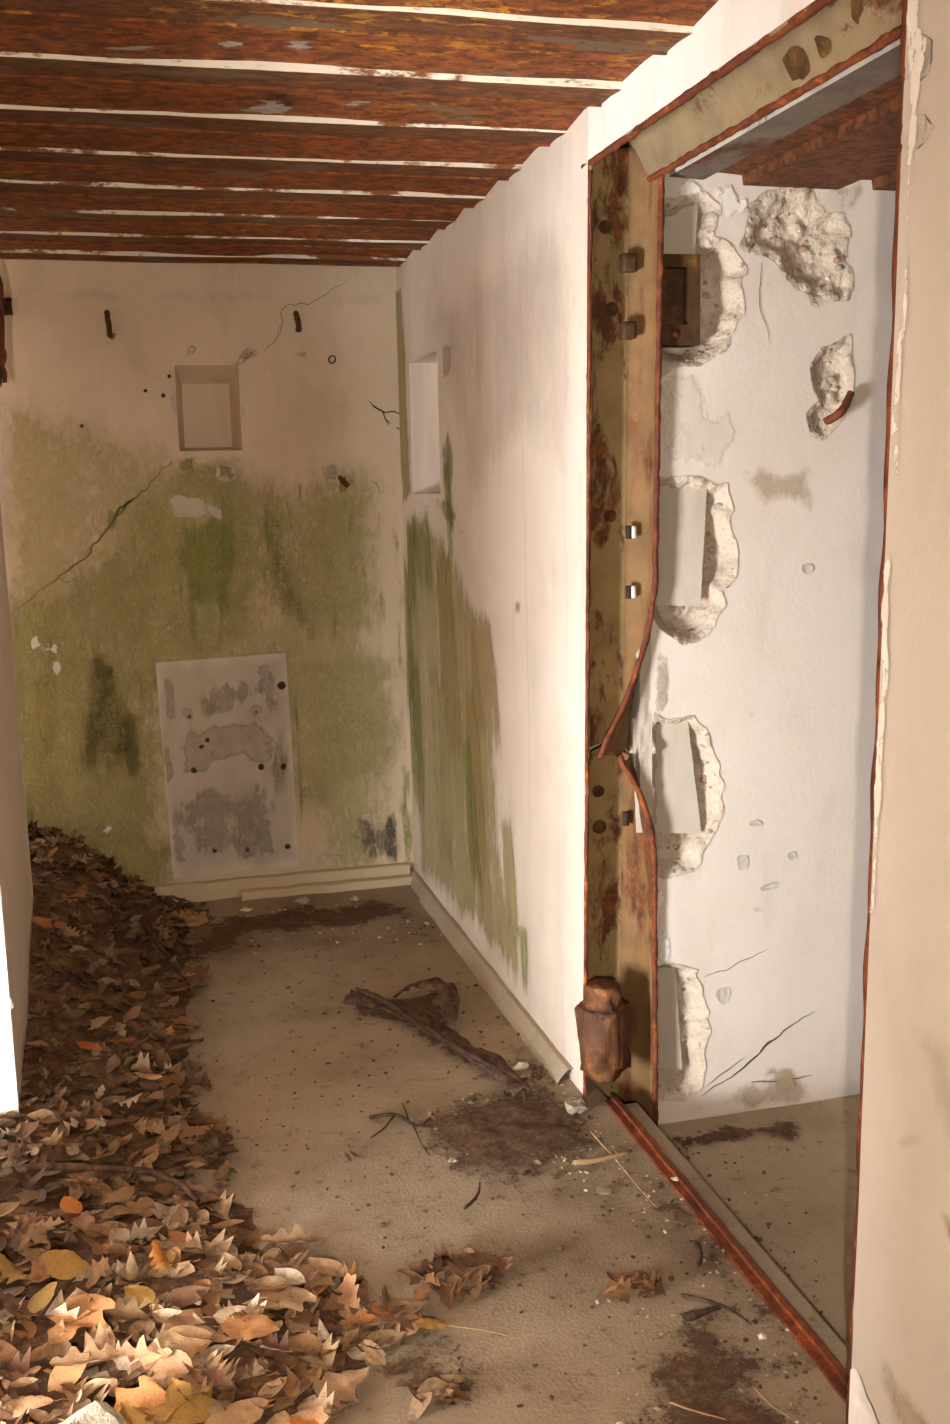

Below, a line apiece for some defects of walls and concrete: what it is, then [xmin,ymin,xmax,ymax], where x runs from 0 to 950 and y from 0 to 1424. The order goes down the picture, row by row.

peeling [901,0,934,221]
spalling [654,180,856,645]
peeling [891,265,907,476]
crack [17,461,173,609]
peeling [165,682,273,782]
peeling [182,785,275,857]
leakage [361,818,396,856]
leakage [502,823,527,987]
spalling [633,715,730,1102]
crack [702,1012,813,1096]